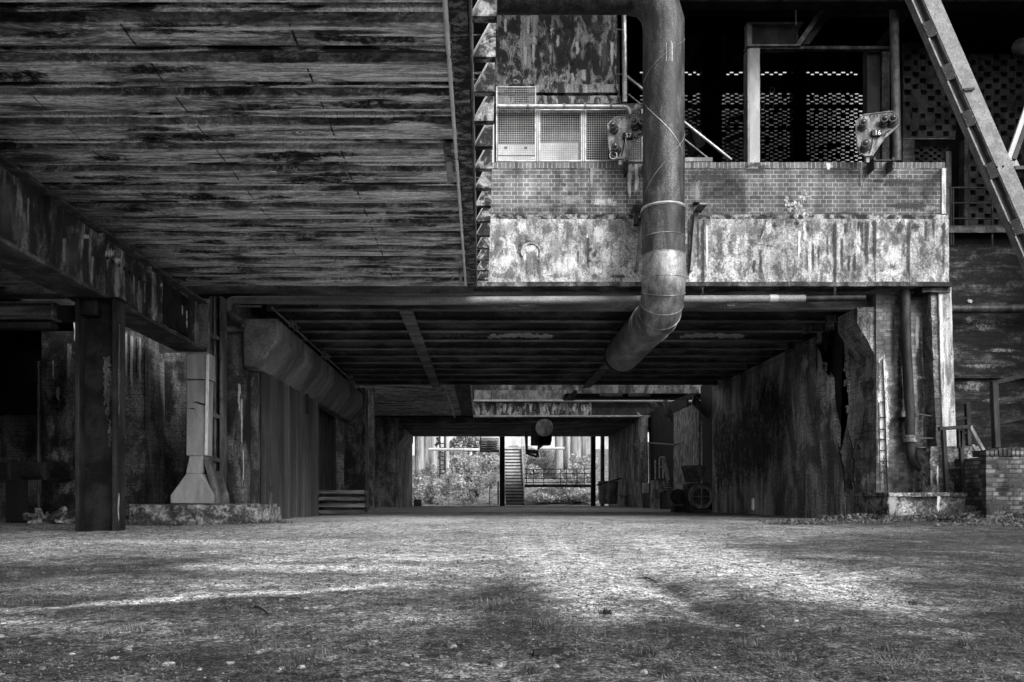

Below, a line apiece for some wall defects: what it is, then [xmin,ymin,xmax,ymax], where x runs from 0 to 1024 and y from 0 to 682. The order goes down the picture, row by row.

water stain [523,16,535,67]
water stain [860,165,933,188]
water stain [798,201,946,293]
crack [838,412,875,493]